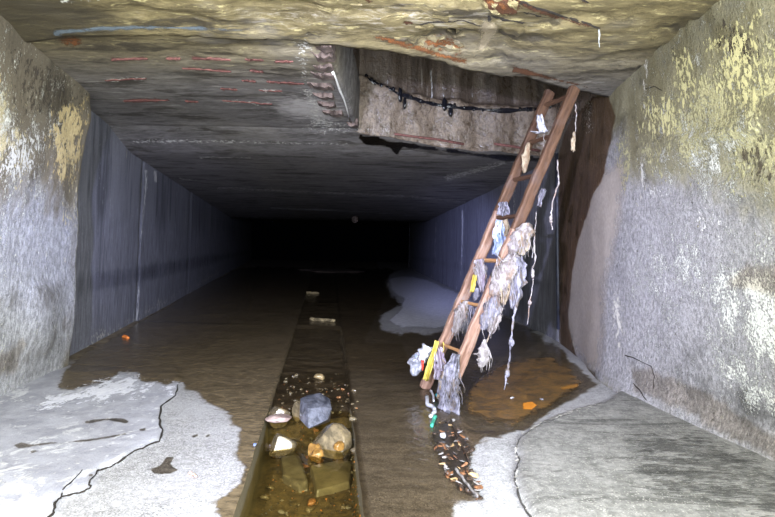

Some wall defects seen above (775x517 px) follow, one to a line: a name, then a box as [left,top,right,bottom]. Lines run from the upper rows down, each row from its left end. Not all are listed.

damp [0,96,89,187]
spalling [394,133,464,145]
damp [637,47,701,138]
damp [703,9,769,117]
crack [47,384,178,517]
crack [514,404,600,517]